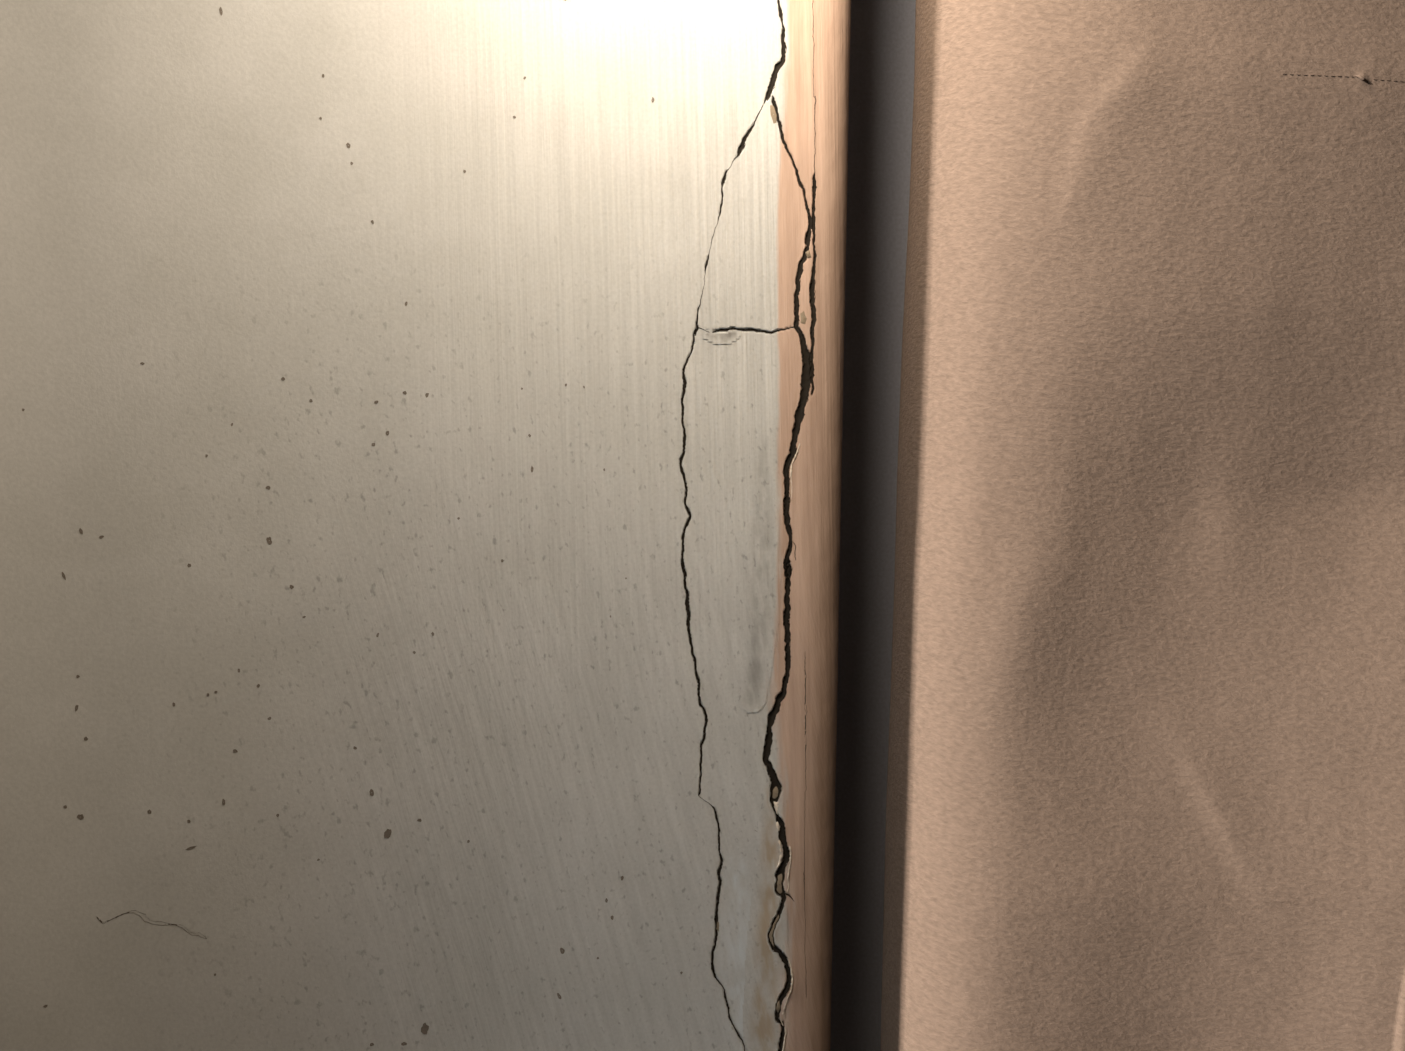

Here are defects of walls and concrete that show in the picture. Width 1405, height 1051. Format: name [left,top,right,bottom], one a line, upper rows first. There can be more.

crack [680,0,817,1051]